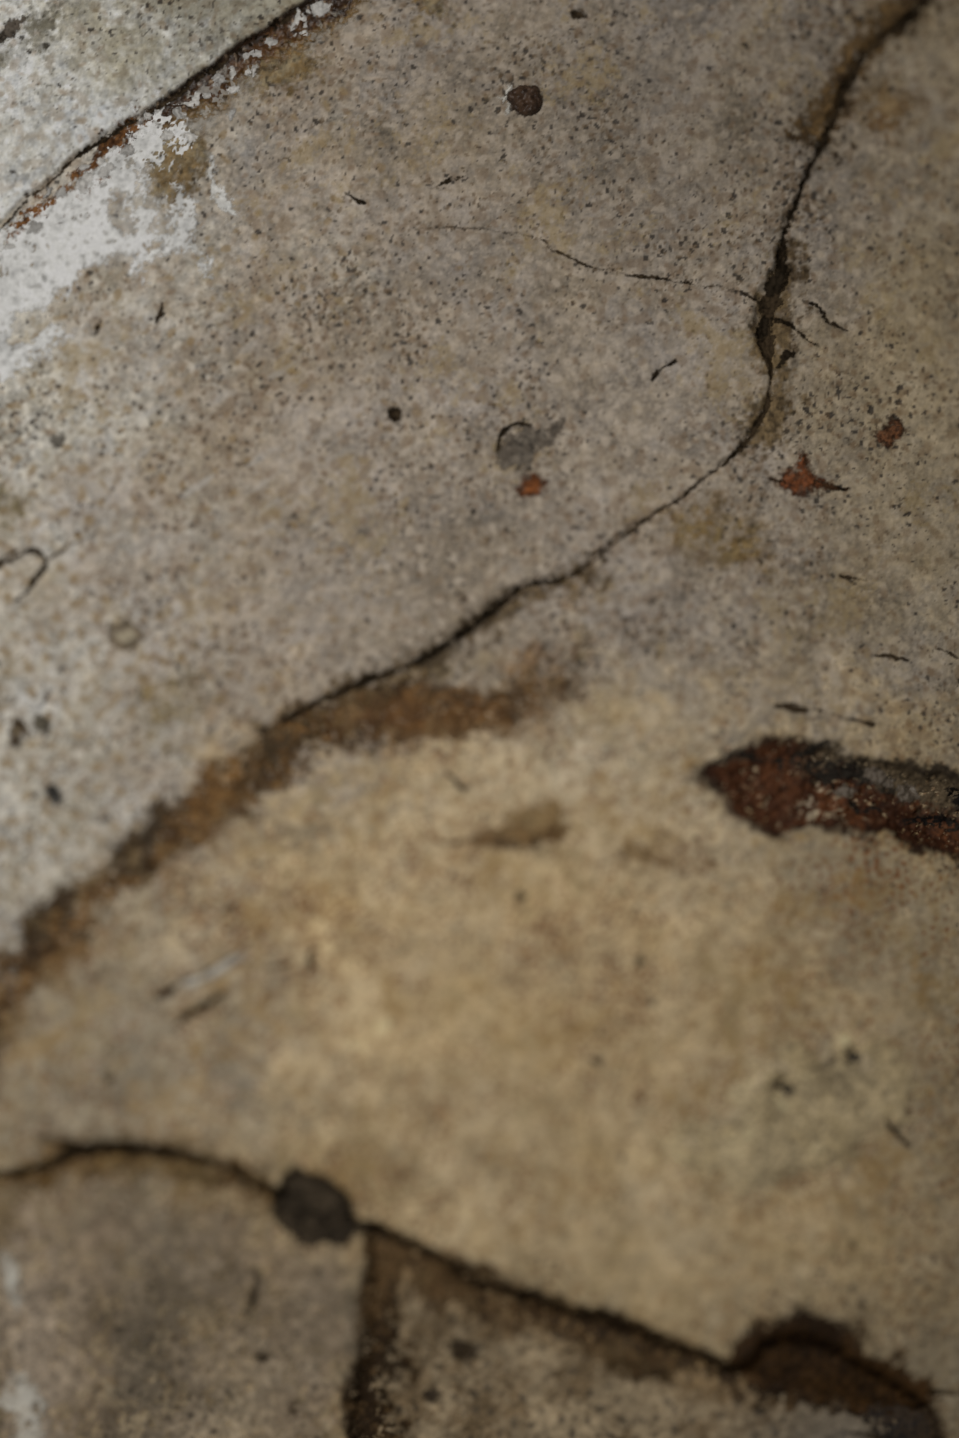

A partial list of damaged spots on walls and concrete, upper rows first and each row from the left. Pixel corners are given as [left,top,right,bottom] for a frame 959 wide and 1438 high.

crack [3,0,321,226]
efflorescence [0,90,236,383]
crack [155,302,165,324]
crack [286,0,930,723]
rust [873,416,904,448]
rust [768,453,849,497]
crack [0,532,97,602]
crack [875,648,956,661]
crack [773,703,875,727]
crack [6,1136,281,1201]
crack [345,1217,387,1242]
crack [246,1269,260,1317]